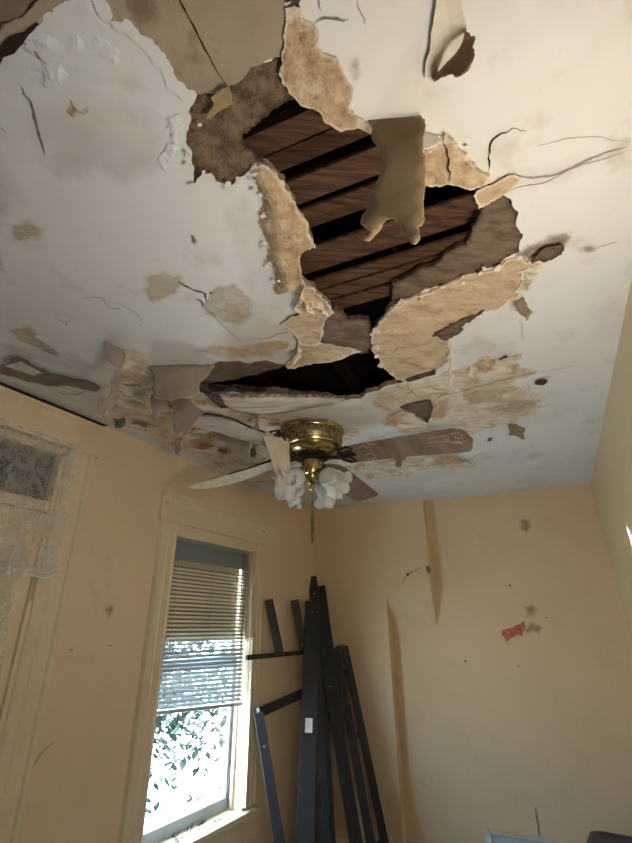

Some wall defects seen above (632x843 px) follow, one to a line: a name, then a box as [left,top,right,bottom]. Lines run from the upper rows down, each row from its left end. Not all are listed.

crack [0,0,39,63]
crack [179,0,228,86]
crack [488,128,525,171]
flaking render [0,0,569,439]
peeling [0,349,276,483]
peeling [330,453,483,480]